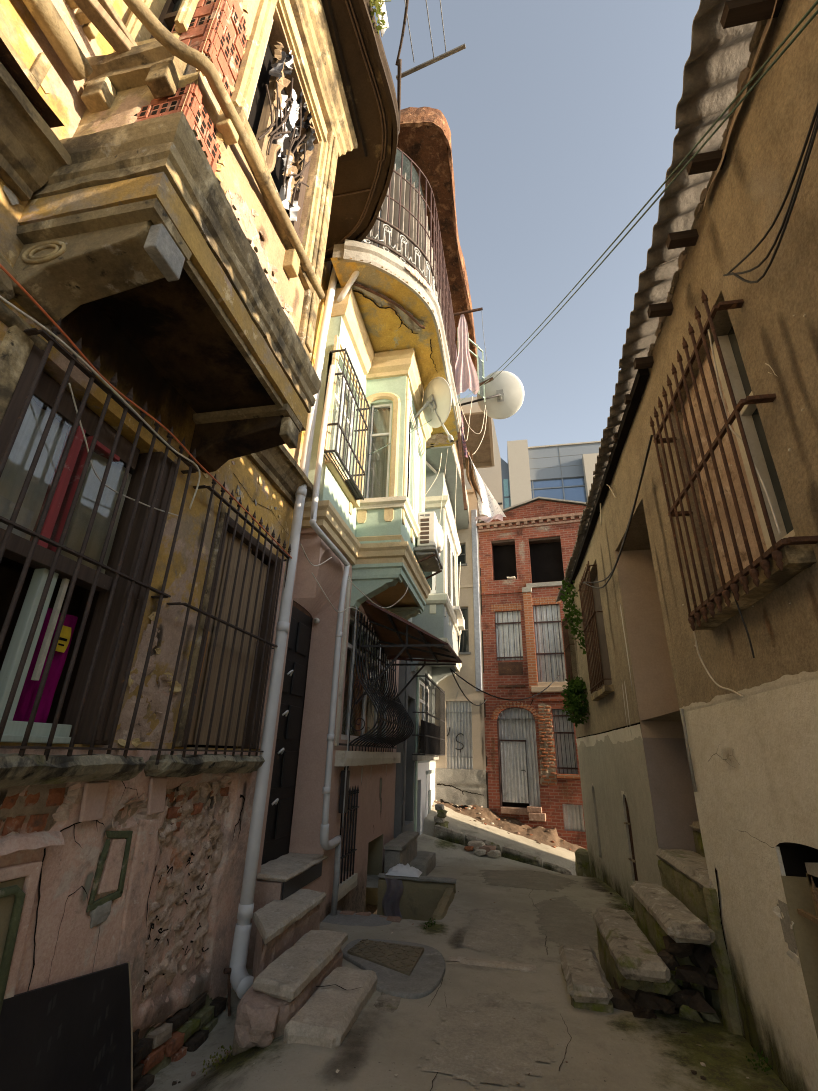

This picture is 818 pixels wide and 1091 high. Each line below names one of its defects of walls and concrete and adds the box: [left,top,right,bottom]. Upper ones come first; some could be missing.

crack [353,290,437,371]
spalling [0,782,84,837]
crack [27,820,105,991]
spalling [97,776,231,1004]
leakage [730,958,806,1091]